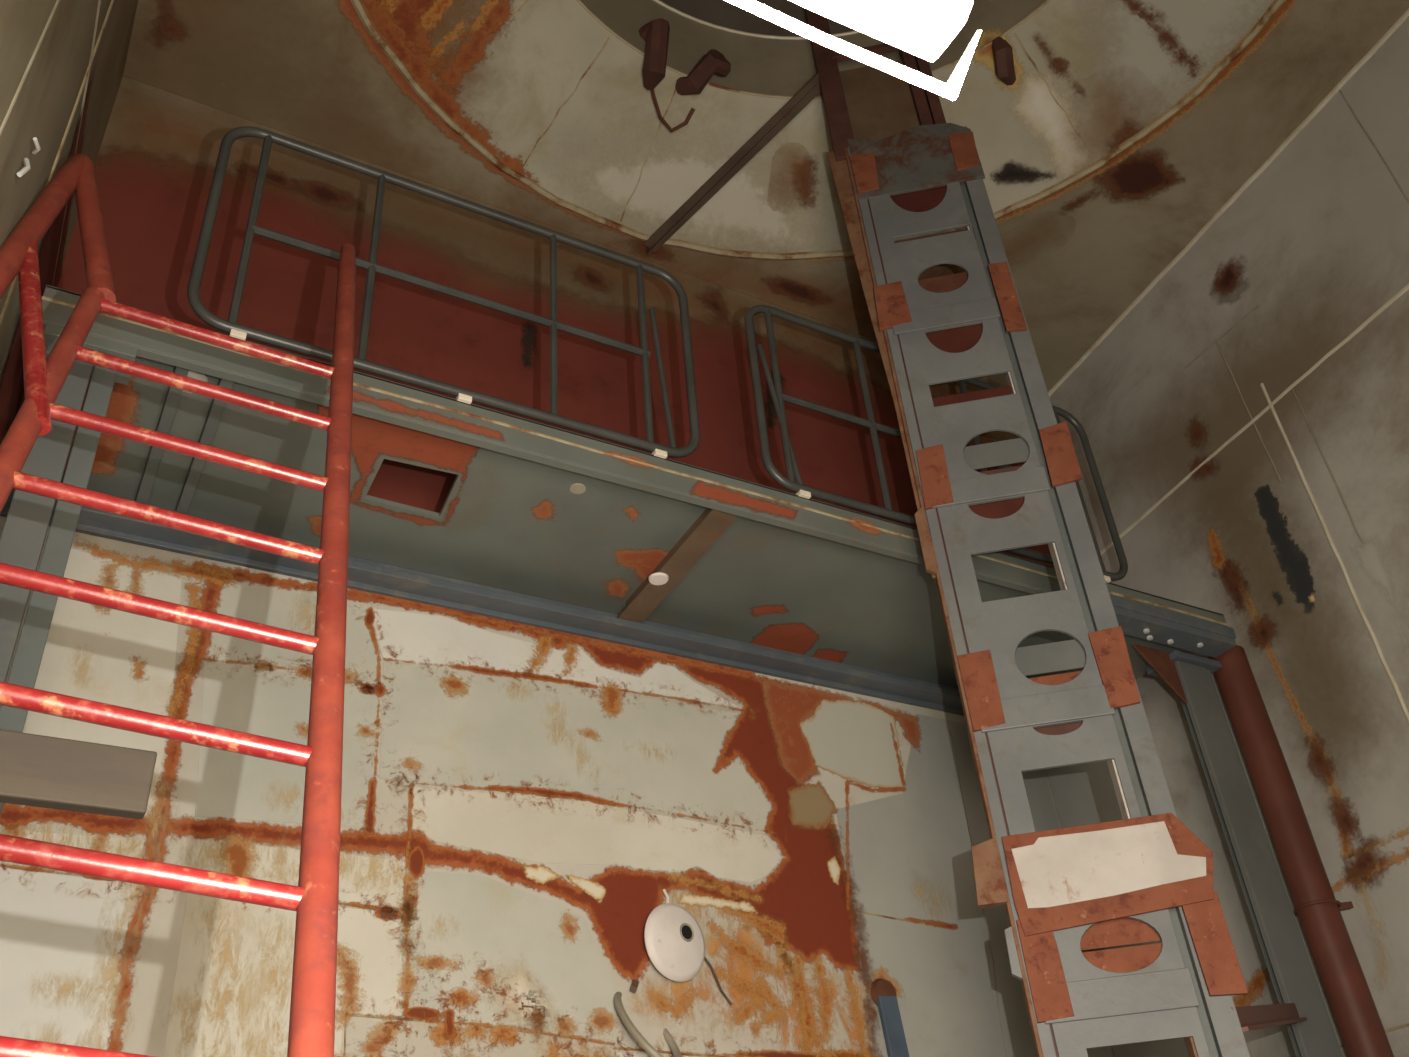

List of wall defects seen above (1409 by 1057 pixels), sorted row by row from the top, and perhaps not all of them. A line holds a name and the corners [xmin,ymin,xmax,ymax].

rust [328,0,671,268]
rust [996,0,1297,224]
rust [167,627,212,720]
rust [74,542,318,613]
rust [347,588,755,679]
leakage [1125,314,1347,730]
rust [1207,529,1409,897]
rust [142,739,182,862]
rust [99,884,159,1052]
rust [335,945,361,1028]
rust [415,956,617,1057]
rust [646,872,902,1055]